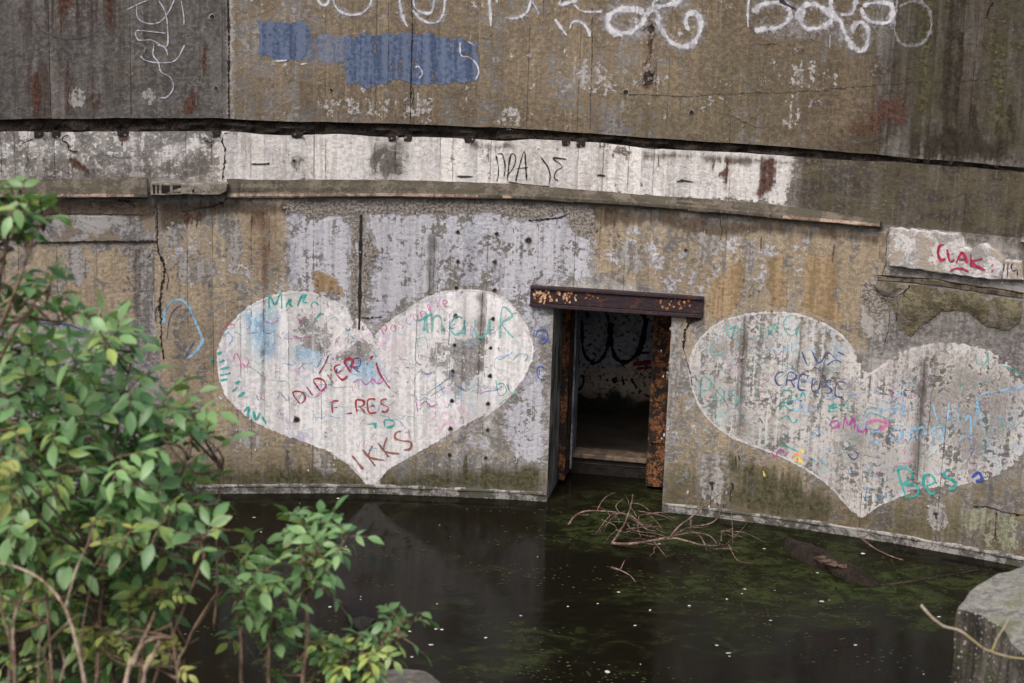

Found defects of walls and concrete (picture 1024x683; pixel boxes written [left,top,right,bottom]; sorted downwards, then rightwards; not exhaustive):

leakage [909,0,1016,164]
rust [756,158,776,198]
crack [16,197,227,359]